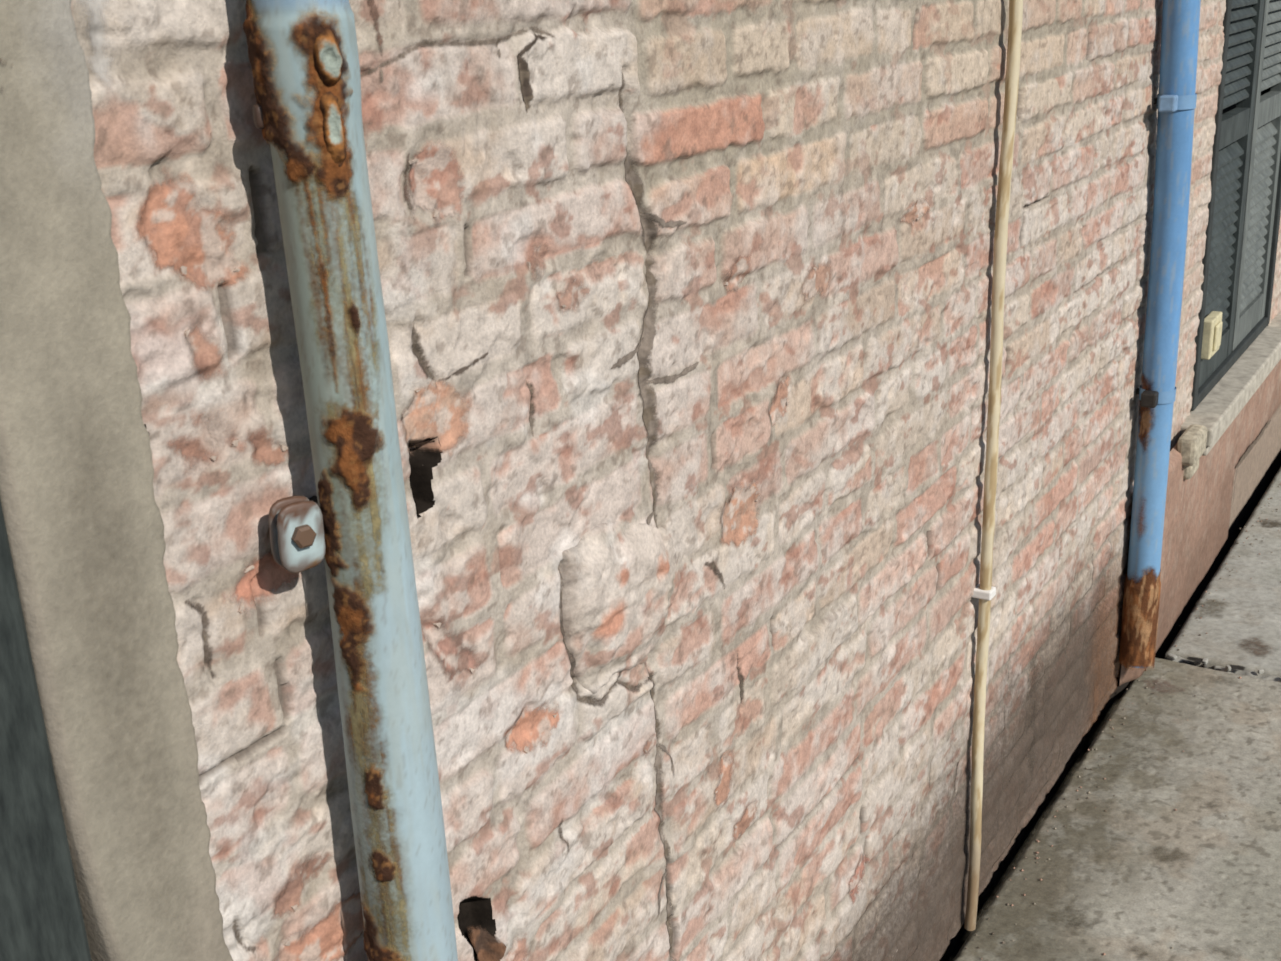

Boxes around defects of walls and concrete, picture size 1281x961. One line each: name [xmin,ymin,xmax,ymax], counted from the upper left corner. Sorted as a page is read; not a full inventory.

crack [361,0,553,111]
crack [617,75,625,112]
rust [243,0,411,961]
crack [558,567,676,961]
crack [611,148,698,529]
rust [1096,568,1161,692]